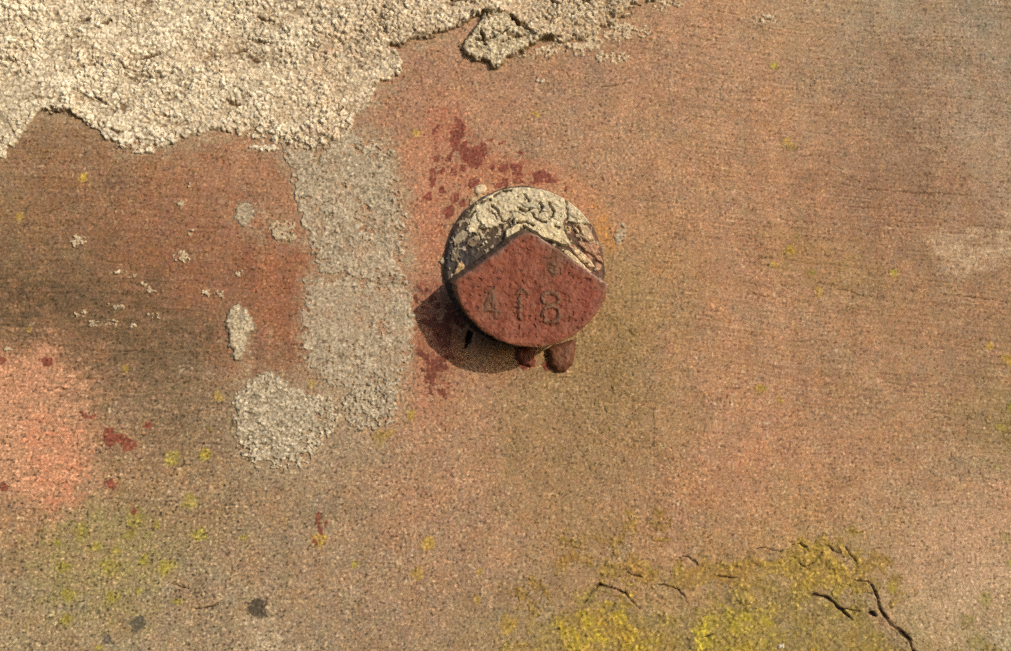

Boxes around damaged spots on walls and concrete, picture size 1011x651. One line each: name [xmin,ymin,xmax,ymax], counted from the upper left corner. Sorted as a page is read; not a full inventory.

flaking render [0,0,655,159]
corrosion [401,98,624,434]
crack [594,574,686,610]
crack [757,543,915,651]